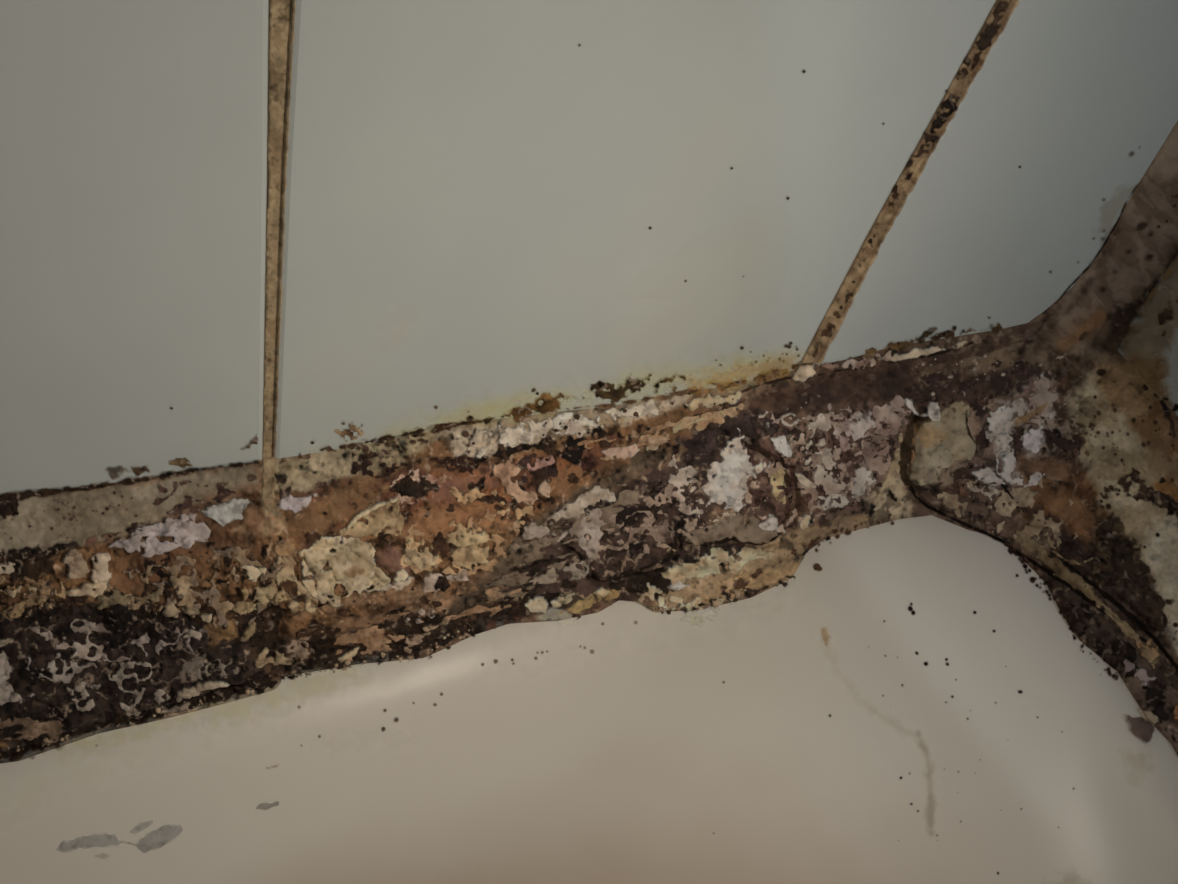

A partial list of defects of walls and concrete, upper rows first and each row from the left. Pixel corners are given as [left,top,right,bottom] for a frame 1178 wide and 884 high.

leakage [889,90,960,206]
corrosion [1157,300,1174,337]
corrosion [292,478,389,535]
peeling [0,353,1159,717]
leakage [583,482,697,578]
leakage [923,280,1178,754]
corrosion [1016,455,1094,536]
corrosion [205,621,236,645]
leakage [0,458,600,762]
leakage [648,569,795,614]
peeling [0,717,64,741]
peeling [1127,705,1178,742]